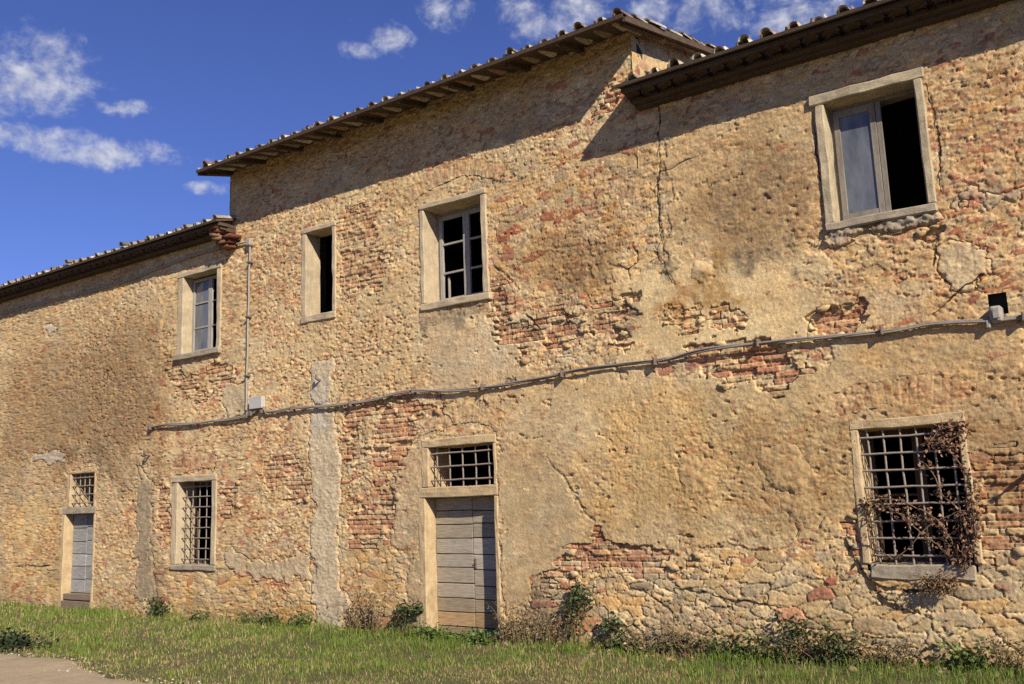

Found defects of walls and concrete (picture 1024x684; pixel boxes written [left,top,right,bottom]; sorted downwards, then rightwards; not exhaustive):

crack [611,106,699,285]
spalling [485,277,816,400]
spalling [805,298,869,335]
spalling [339,388,446,553]
spalling [540,526,704,592]
spalling [970,441,1024,565]